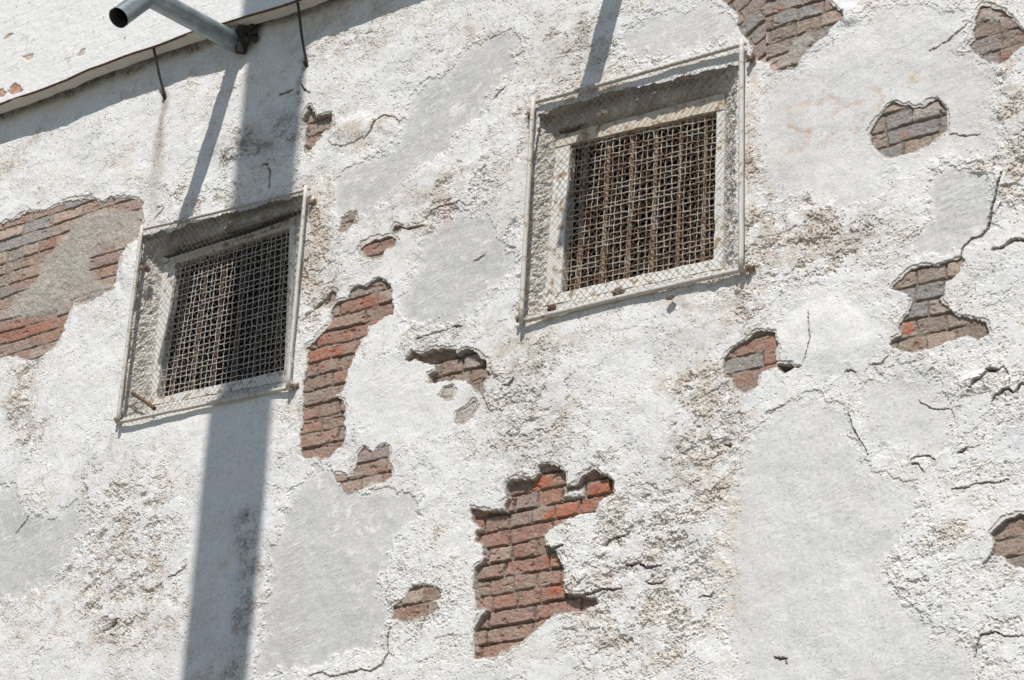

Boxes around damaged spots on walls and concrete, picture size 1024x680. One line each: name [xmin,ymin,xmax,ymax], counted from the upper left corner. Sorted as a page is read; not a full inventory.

spalling [301,105,333,153]
crack [960,171,1024,258]
spalling [0,196,144,361]
crack [802,310,811,363]
flaking render [616,0,1024,680]
crack [844,355,889,373]
flaking render [249,203,518,680]
crack [847,411,869,456]
spalling [469,463,615,660]